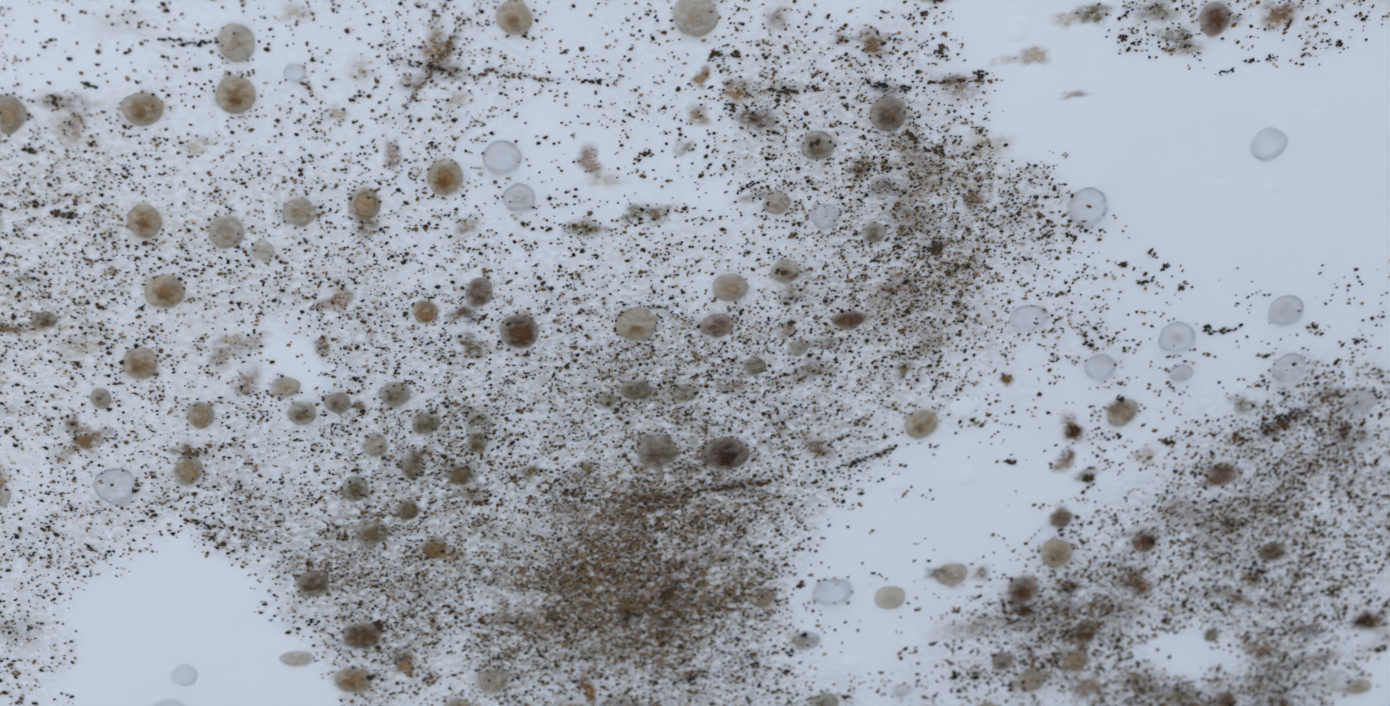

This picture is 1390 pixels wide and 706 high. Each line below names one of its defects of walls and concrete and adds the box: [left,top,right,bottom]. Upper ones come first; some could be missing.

mould [116,0,157,55]
mould [208,50,255,78]
mould [521,1,553,53]
mould [1015,47,1045,62]
mould [1065,0,1390,76]
water stain [572,149,599,172]
mould [167,396,199,436]
water stain [897,292,1390,706]